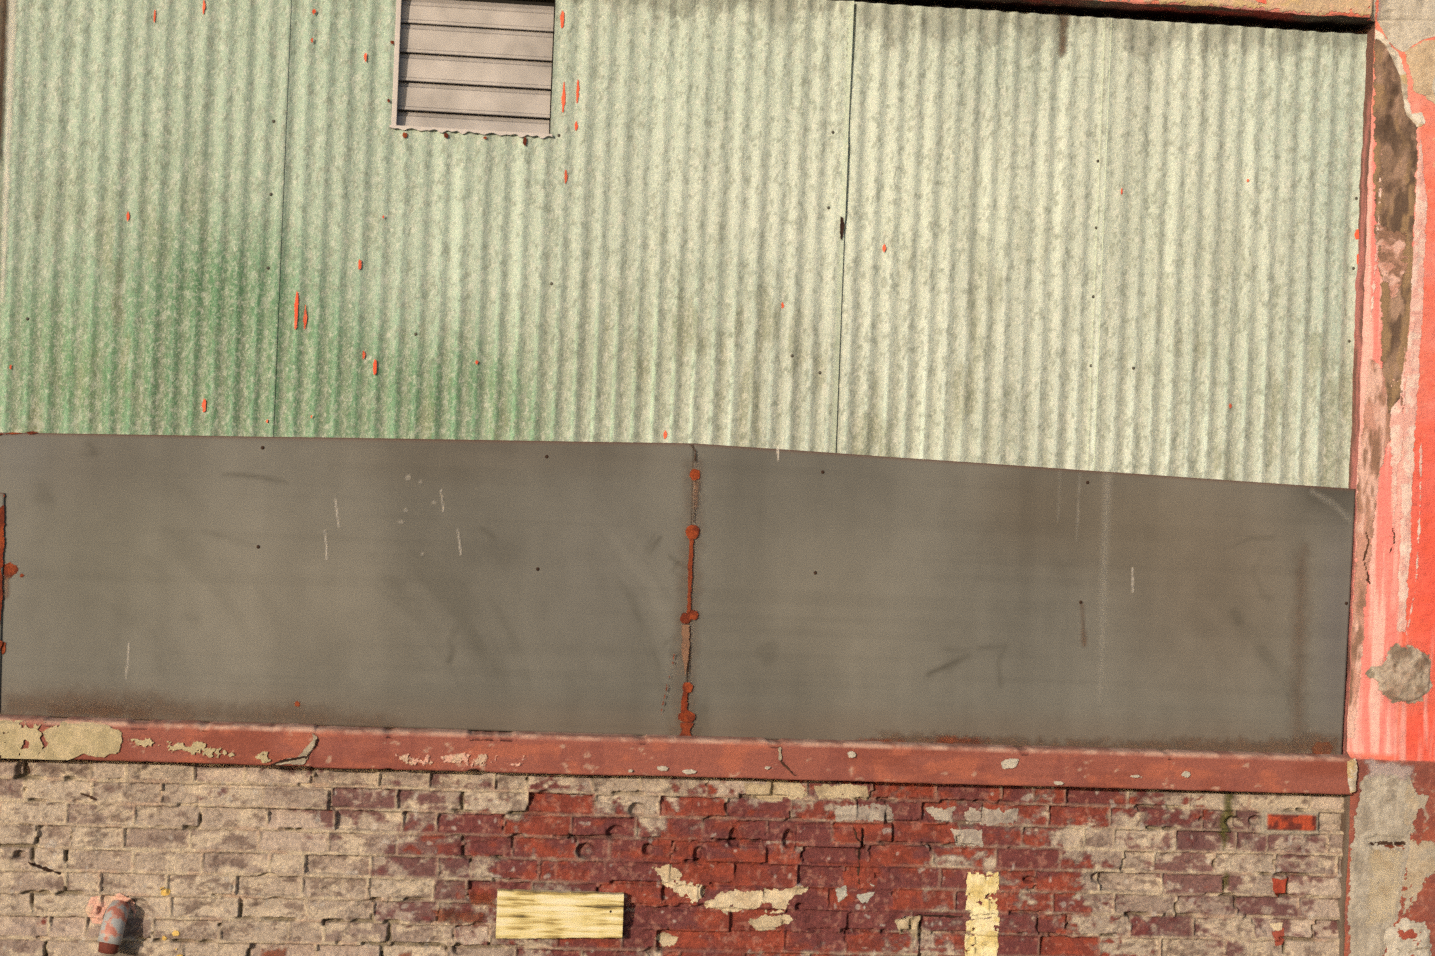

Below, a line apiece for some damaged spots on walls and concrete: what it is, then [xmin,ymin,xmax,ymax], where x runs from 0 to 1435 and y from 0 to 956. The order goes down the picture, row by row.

spalling [1095,0,1435,739]
rust [0,495,24,620]
rust [661,444,700,736]
peeling [0,720,234,760]
peeling [395,753,524,767]
peeling [744,766,894,823]
peeling [925,806,1019,847]
spalling [1347,758,1435,956]
peeling [652,864,808,931]
peeling [835,884,875,909]
peeling [655,932,678,947]
peeling [895,914,922,956]